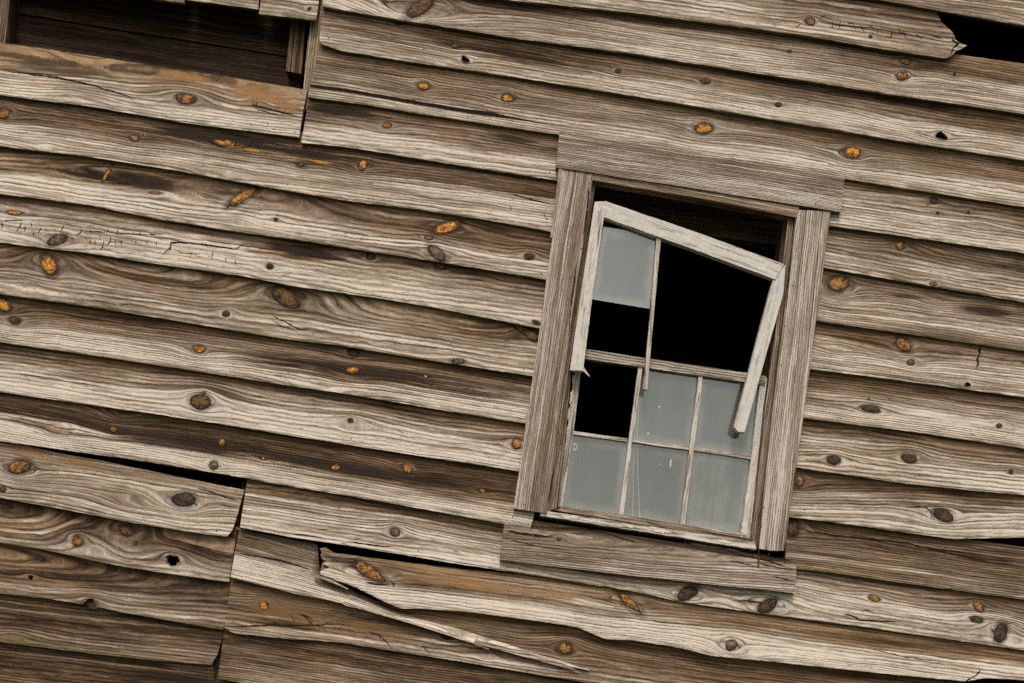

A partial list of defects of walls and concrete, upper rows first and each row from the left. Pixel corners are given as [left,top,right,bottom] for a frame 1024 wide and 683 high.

crack [797,15,959,55]
crack [0,220,253,263]